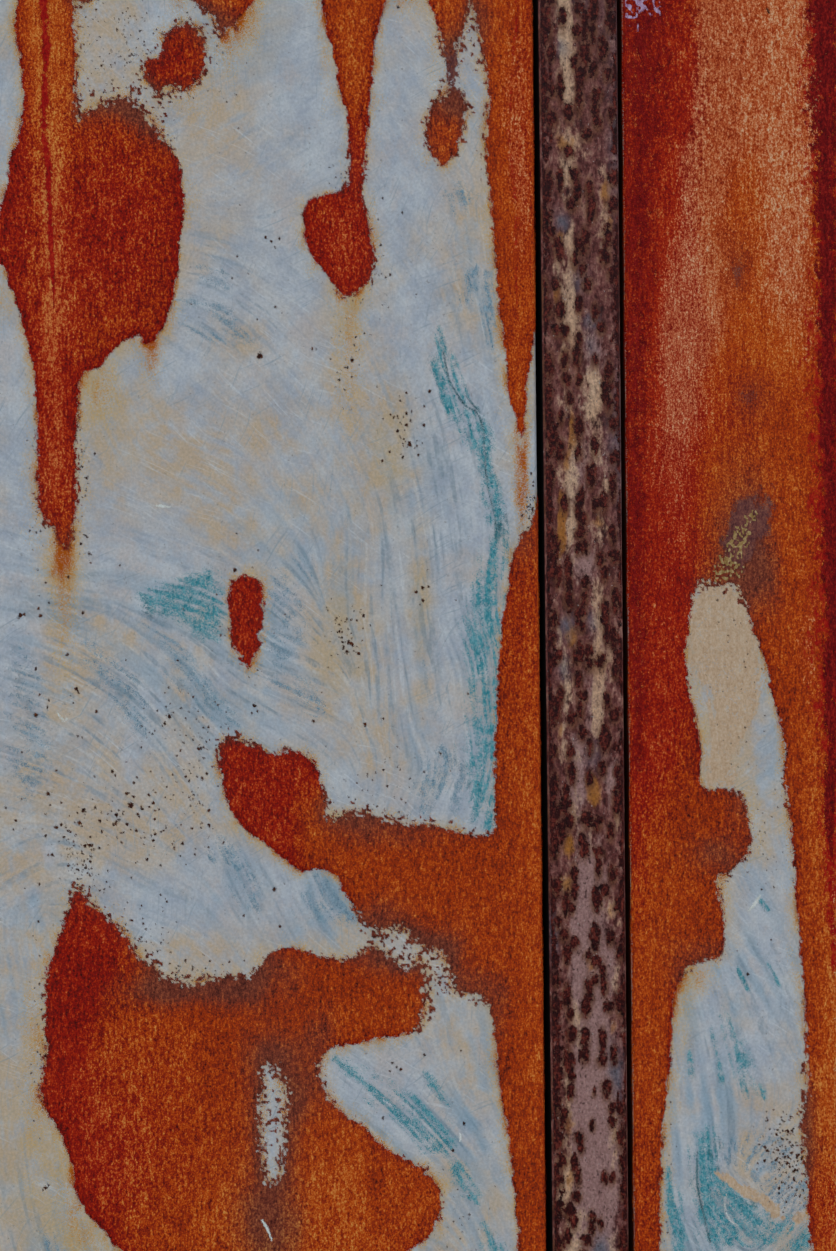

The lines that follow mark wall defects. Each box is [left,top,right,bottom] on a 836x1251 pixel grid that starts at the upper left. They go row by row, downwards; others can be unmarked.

corrosion [0,0,546,1251]
corrosion [540,0,836,1251]